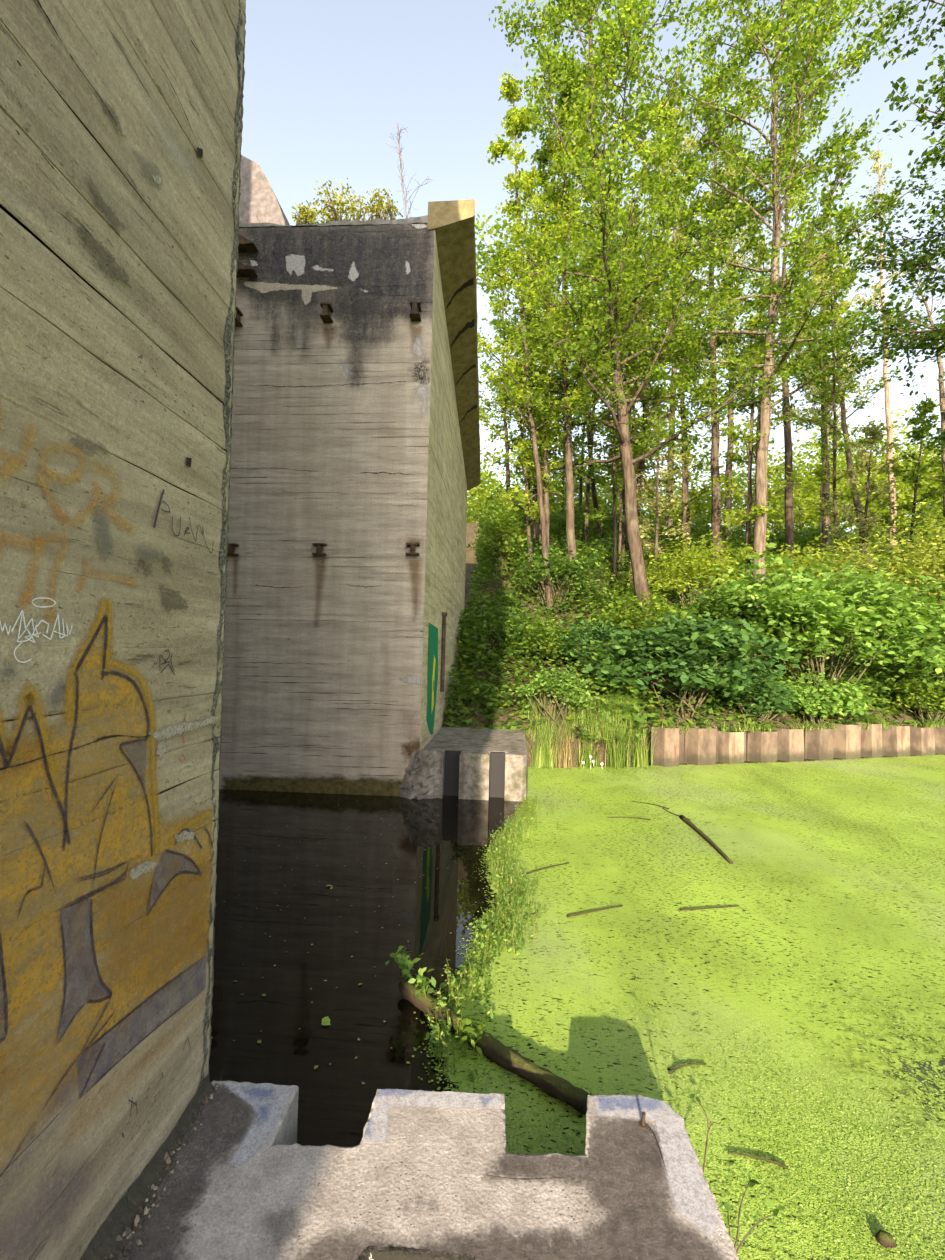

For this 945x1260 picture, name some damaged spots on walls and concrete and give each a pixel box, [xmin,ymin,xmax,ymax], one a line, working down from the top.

spalling [285,254,333,277]
spalling [348,262,368,292]
water stain [240,224,435,380]